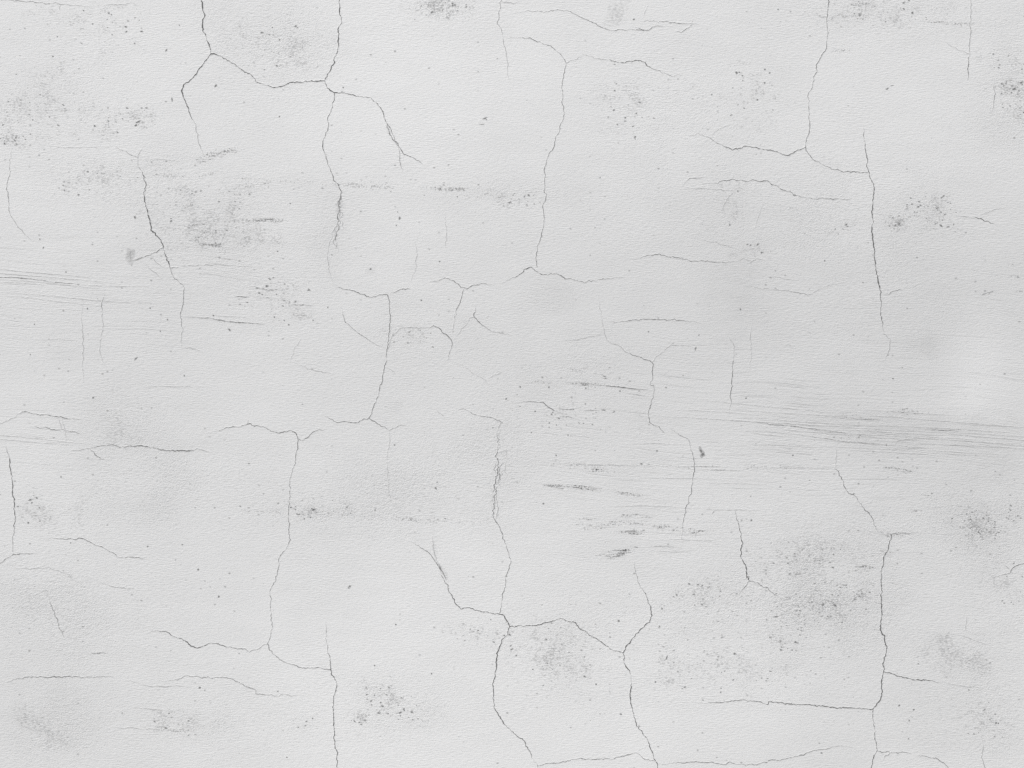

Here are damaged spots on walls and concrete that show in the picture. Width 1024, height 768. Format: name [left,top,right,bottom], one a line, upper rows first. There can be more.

crack [945,0,996,116]
crack [633,239,843,296]
crack [682,0,922,362]
crack [958,206,1007,225]
crack [0,0,701,768]
crack [728,318,754,414]
crack [411,408,984,768]